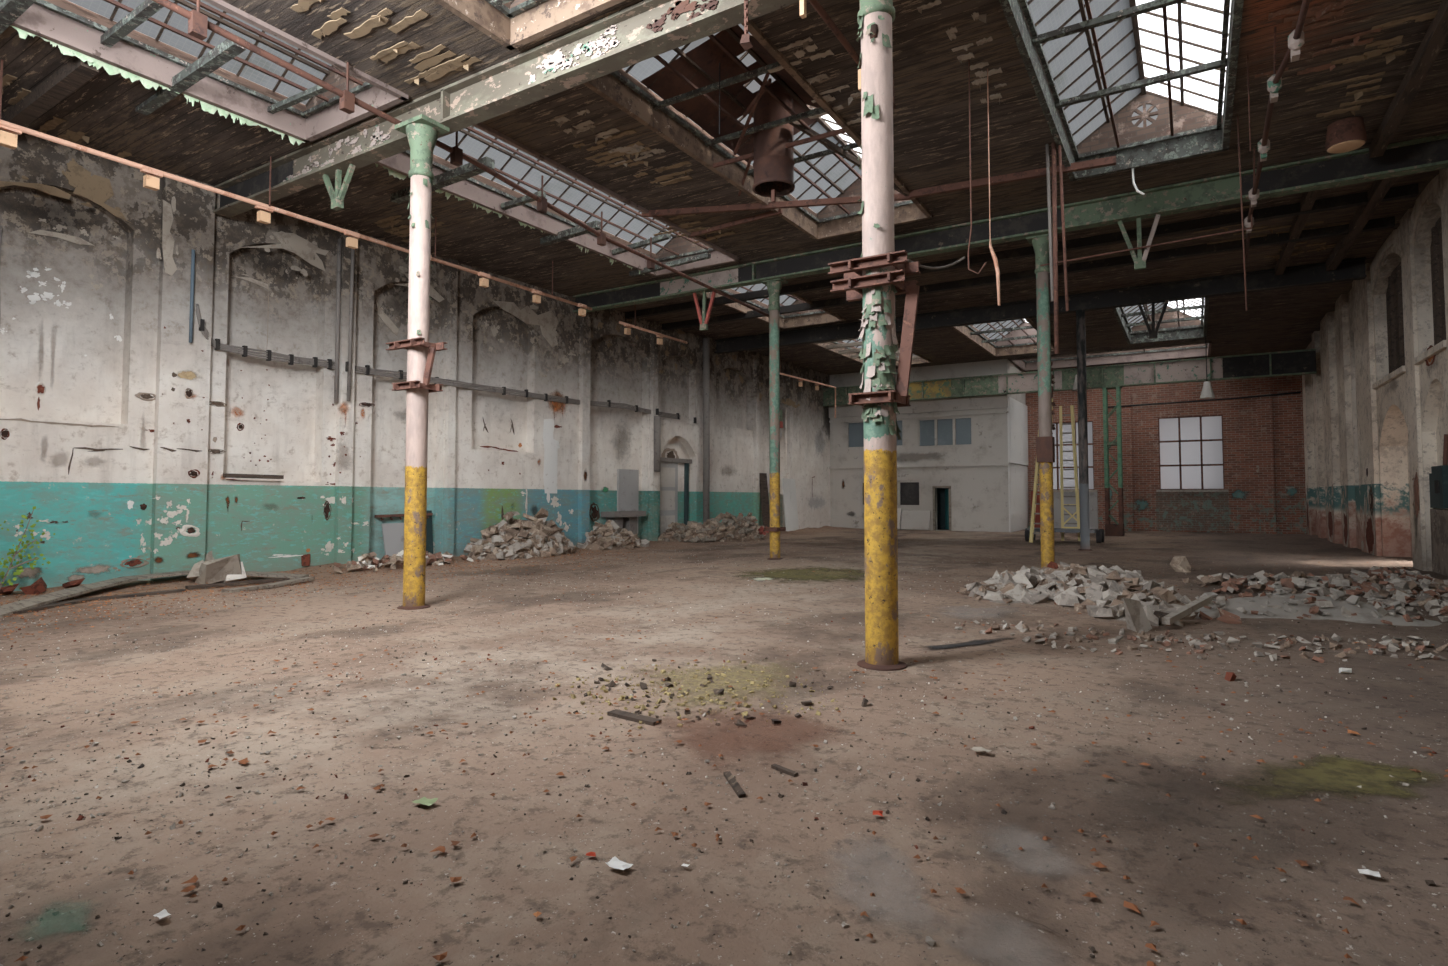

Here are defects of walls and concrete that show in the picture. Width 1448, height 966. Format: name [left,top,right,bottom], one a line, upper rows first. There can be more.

peeling [347,140,410,180]
peeling [20,267,72,309]
peeling [68,497,214,581]